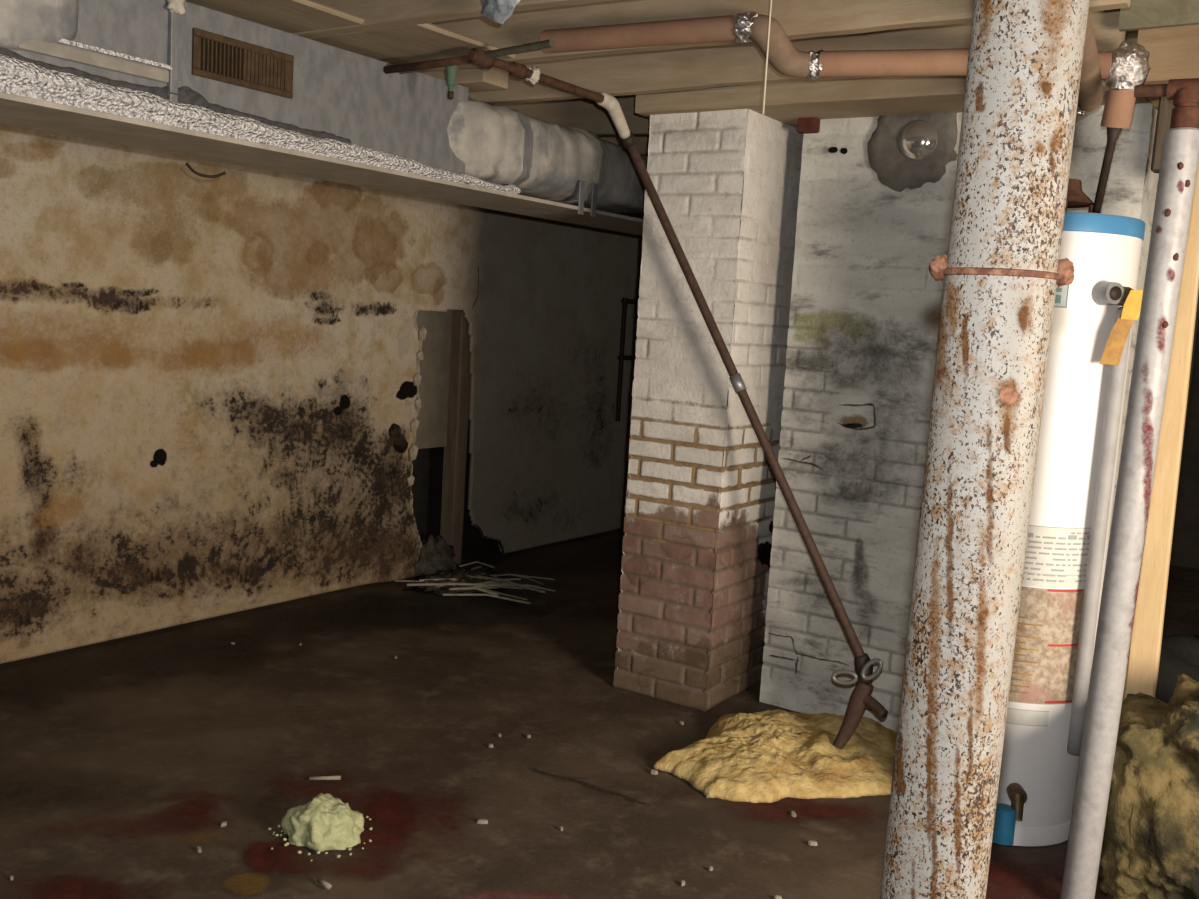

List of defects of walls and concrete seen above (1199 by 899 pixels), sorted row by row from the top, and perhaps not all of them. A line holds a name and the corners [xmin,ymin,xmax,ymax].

corrosion [976,84,984,111]
corrosion [1036,134,1061,173]
leakage [0,280,218,314]
leakage [306,292,396,336]
leakage [795,313,913,384]
corrosion [935,289,969,393]
corrosion [1019,298,1031,331]
corrosion [980,381,1021,564]
leakage [0,370,514,708]
peeling [616,401,780,661]
corrosion [926,485,954,899]
corrosion [954,583,988,889]